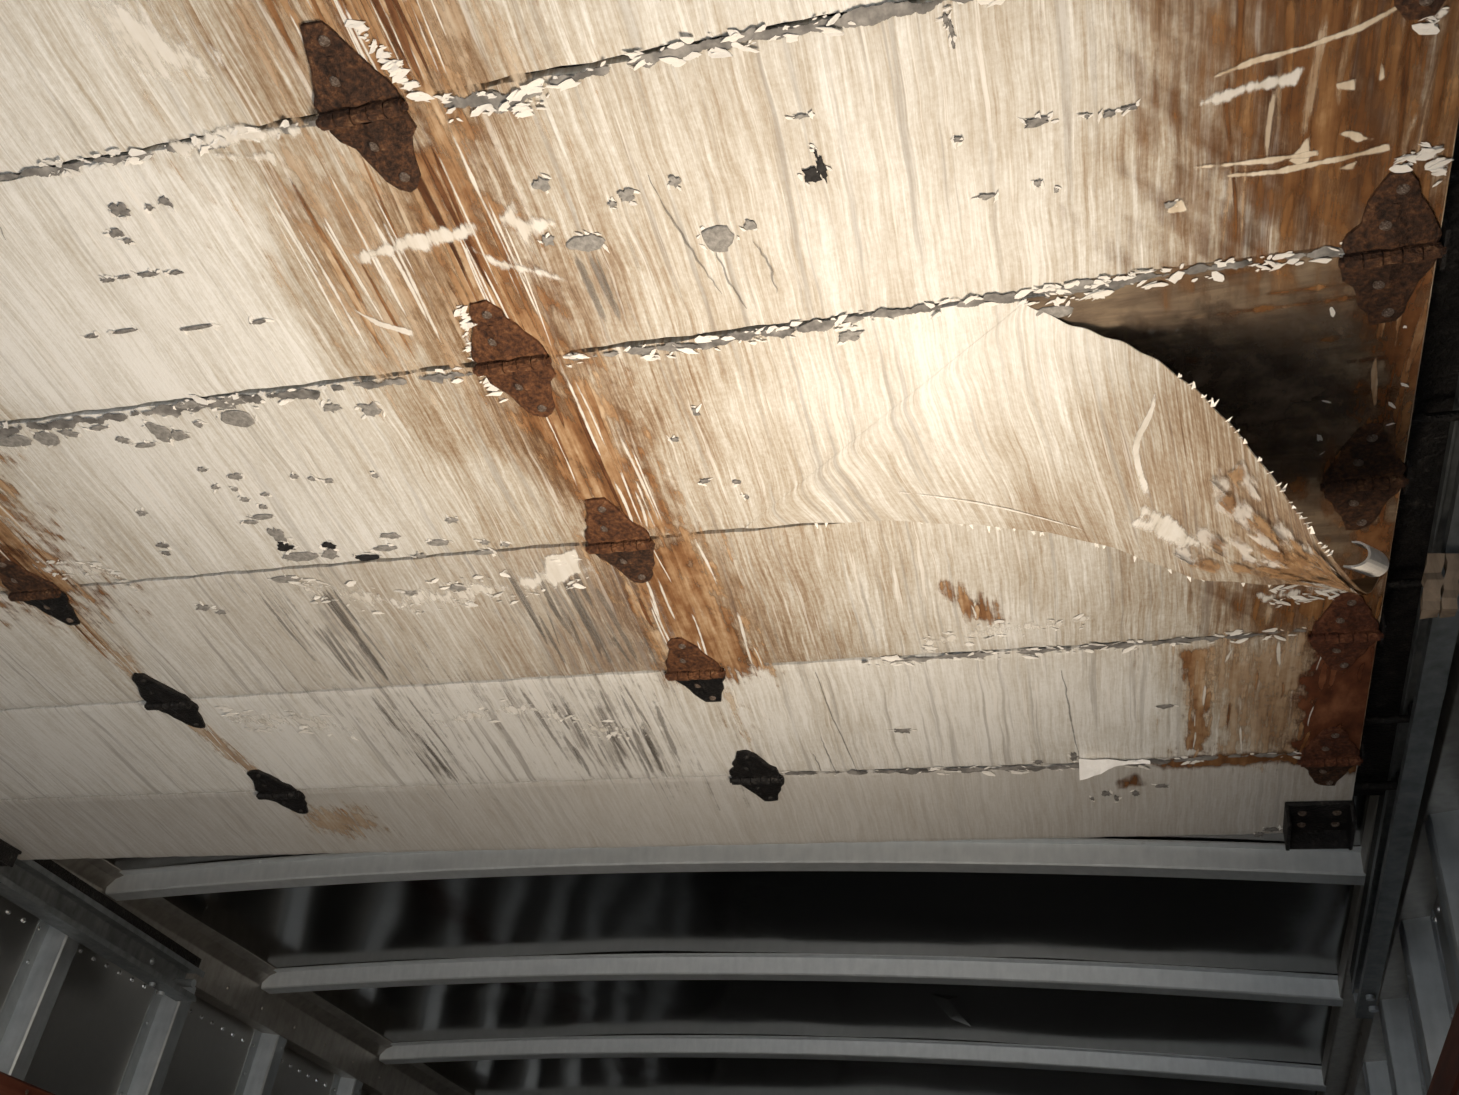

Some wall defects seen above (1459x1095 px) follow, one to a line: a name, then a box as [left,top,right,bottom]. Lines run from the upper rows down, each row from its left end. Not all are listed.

peeling [0,120,316,181]
peeling [345,0,1005,123]
peeling [1201,68,1302,105]
rust [1191,0,1459,290]
peeling [1389,142,1453,187]
peeling [360,224,475,264]
rust [234,0,776,741]
rust [1347,265,1435,463]
rust [0,455,141,677]
peeling [198,467,590,614]
rust [939,581,1001,625]
rust [1151,465,1399,775]